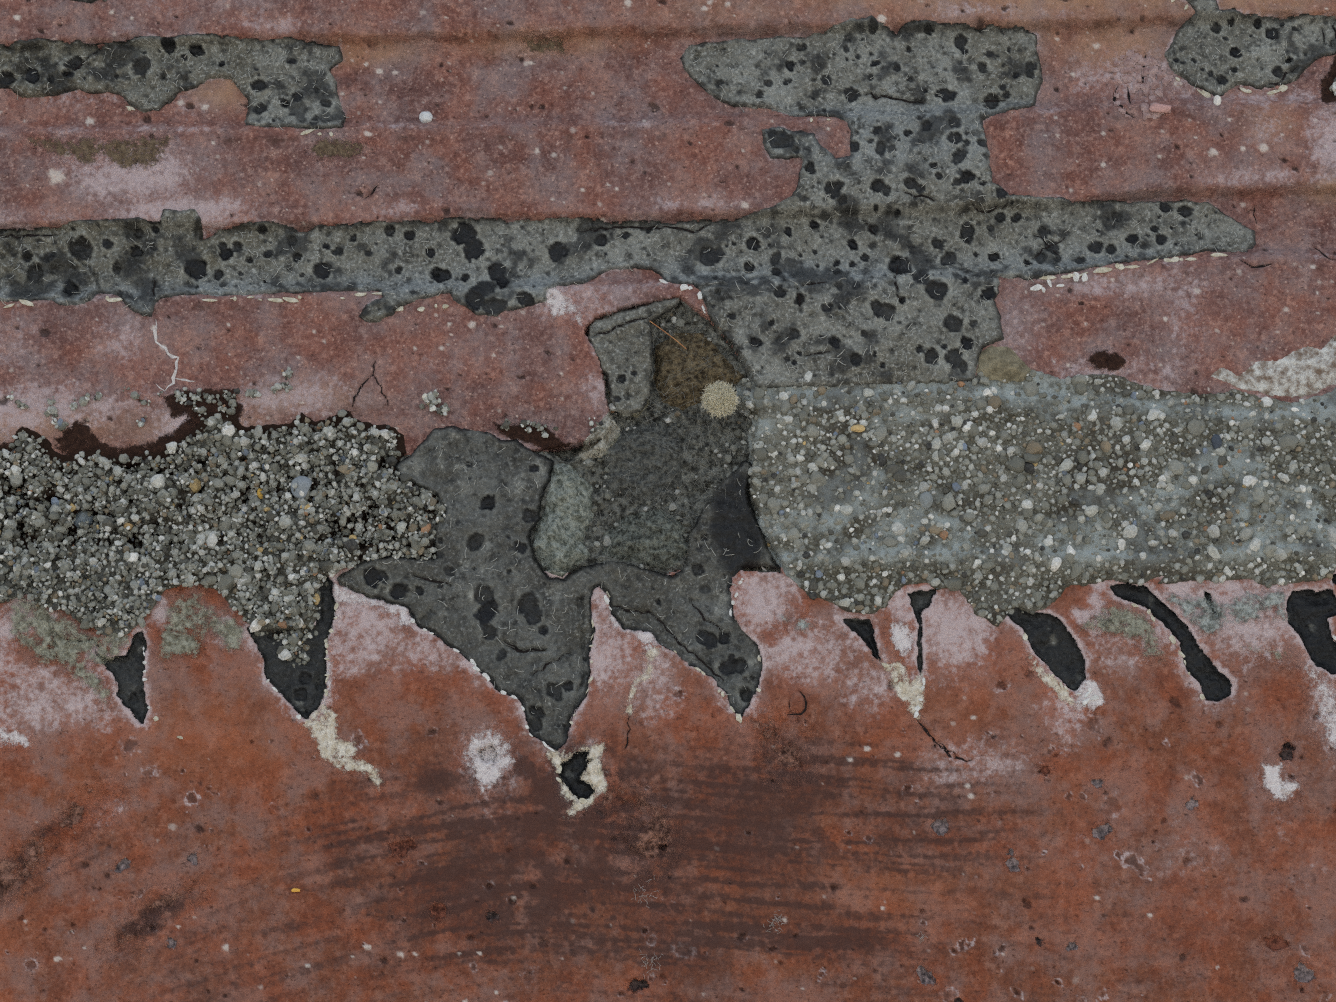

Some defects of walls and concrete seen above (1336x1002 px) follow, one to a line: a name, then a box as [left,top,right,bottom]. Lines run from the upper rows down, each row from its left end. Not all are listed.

peeling [1113,0,1336,120]
peeling [0,15,1256,414]
crack [153,322,194,391]
peeling [95,631,159,724]
peeling [247,425,801,858]
peeling [843,618,902,687]
peeling [908,589,936,718]
peeling [1005,607,1099,705]
peeling [1110,583,1231,701]
peeling [1287,574,1336,674]
water stain [0,728,29,747]